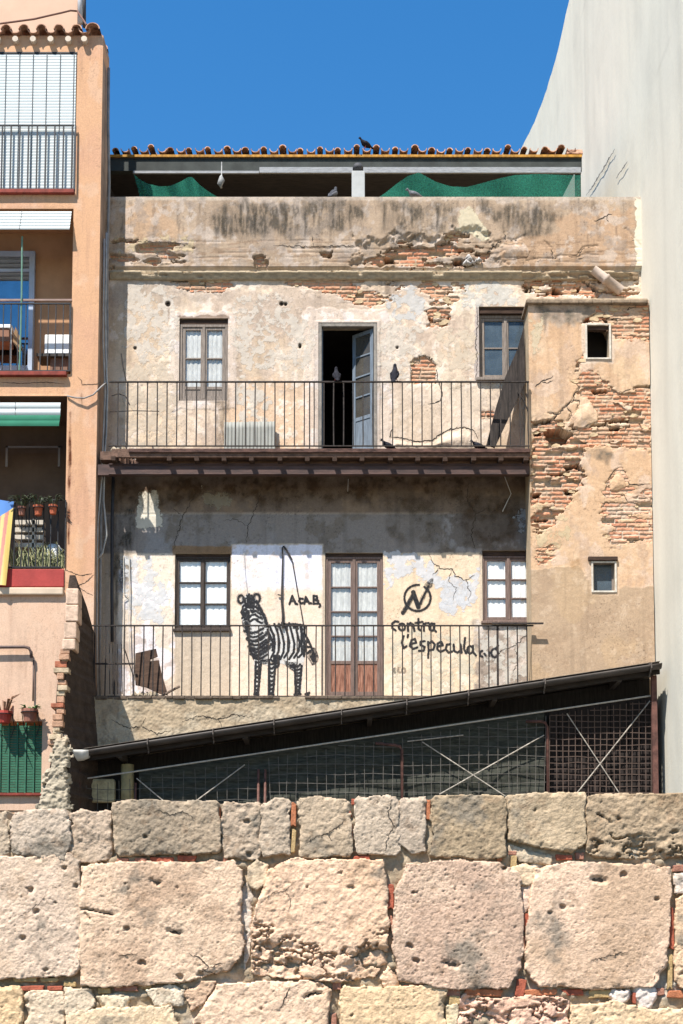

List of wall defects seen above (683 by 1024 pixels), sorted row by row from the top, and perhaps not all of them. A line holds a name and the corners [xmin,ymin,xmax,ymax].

damp [215,203,324,234]
damp [333,206,362,229]
damp [482,206,555,234]
spalling [110,234,194,270]
peeling [123,206,649,449]
spalling [512,356,653,565]
peeling [135,490,163,530]
peeling [383,550,480,616]
crack [428,553,473,600]